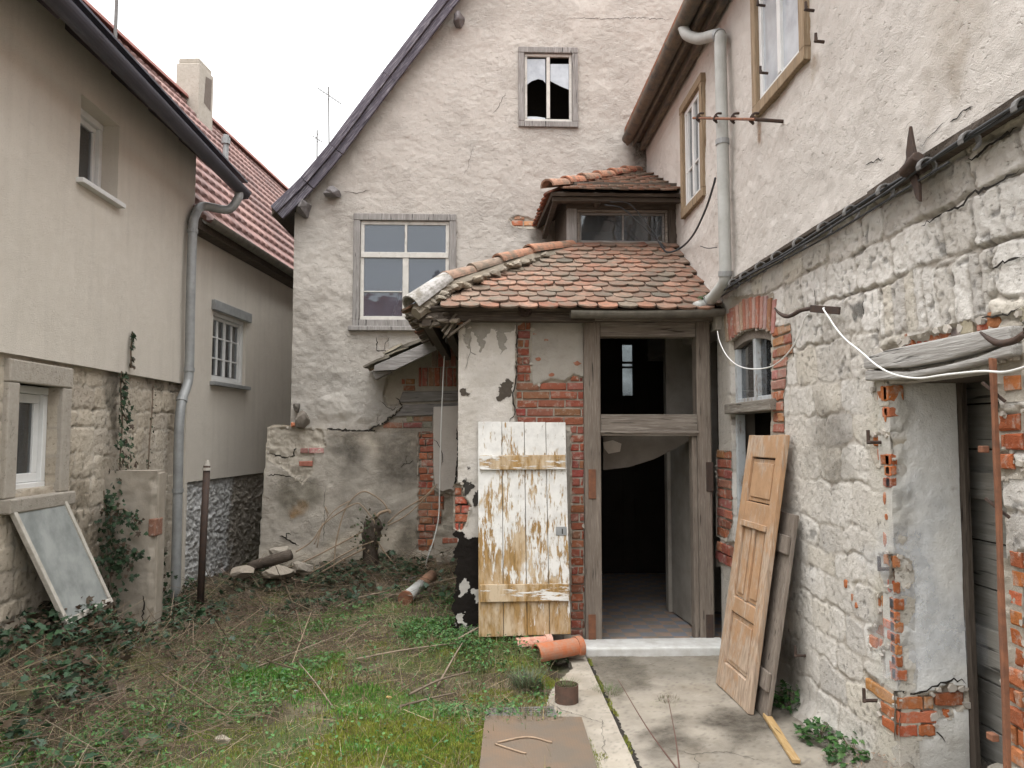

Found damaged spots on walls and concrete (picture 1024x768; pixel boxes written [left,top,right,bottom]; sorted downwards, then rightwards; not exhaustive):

flaking render [508,215,545,229]
crack [923,169,1020,226]
flaking render [266,426,327,484]
crack [327,398,403,432]
flaking render [372,345,472,561]
flaking render [458,322,585,639]
flaking render [997,352,1024,481]
flaking render [863,380,971,742]
flaking render [999,549,1024,768]